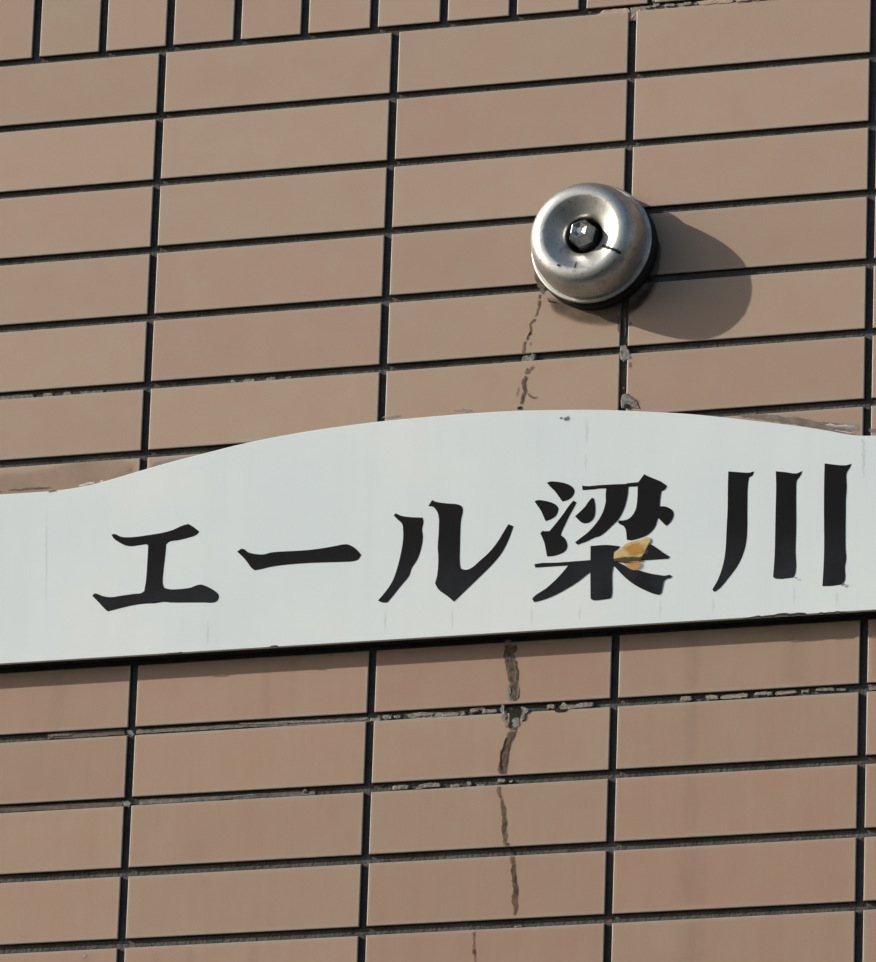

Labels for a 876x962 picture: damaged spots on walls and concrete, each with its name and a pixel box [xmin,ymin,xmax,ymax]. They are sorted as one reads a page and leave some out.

crack [517,295,541,410]
corrosion [614,537,650,570]
spalling [370,707,514,722]
spalling [547,702,595,712]
spalling [680,687,847,703]
crack [497,639,531,914]